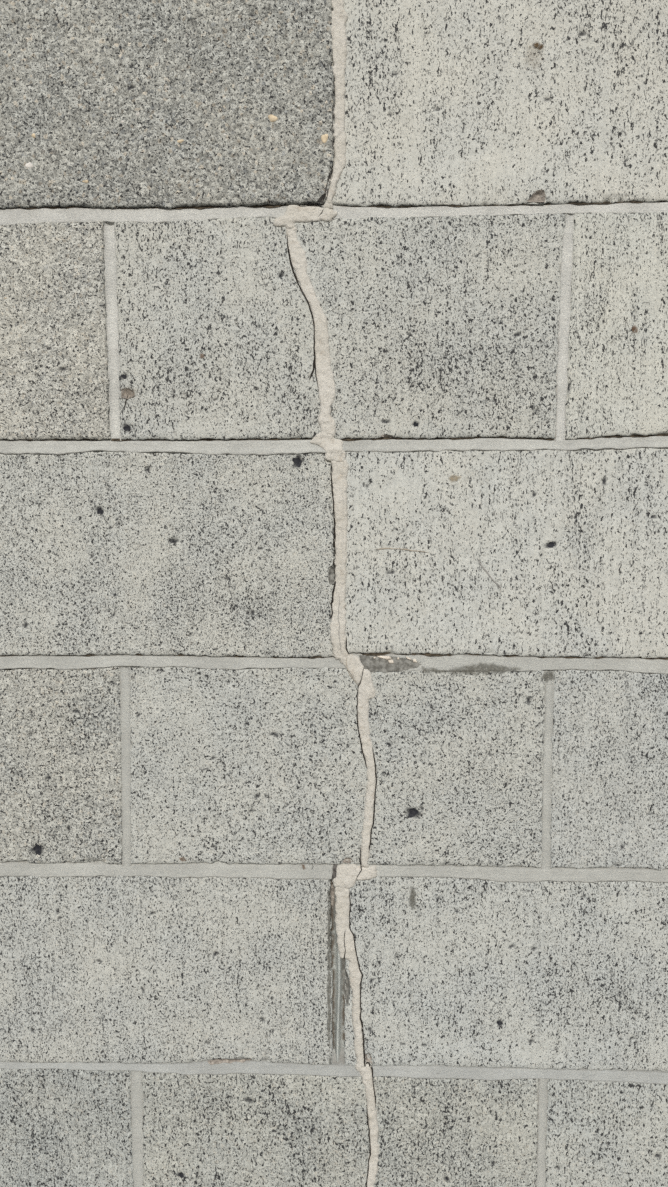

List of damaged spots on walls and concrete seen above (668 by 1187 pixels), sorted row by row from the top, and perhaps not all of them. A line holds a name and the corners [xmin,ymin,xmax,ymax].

crack [273,0,380,1187]